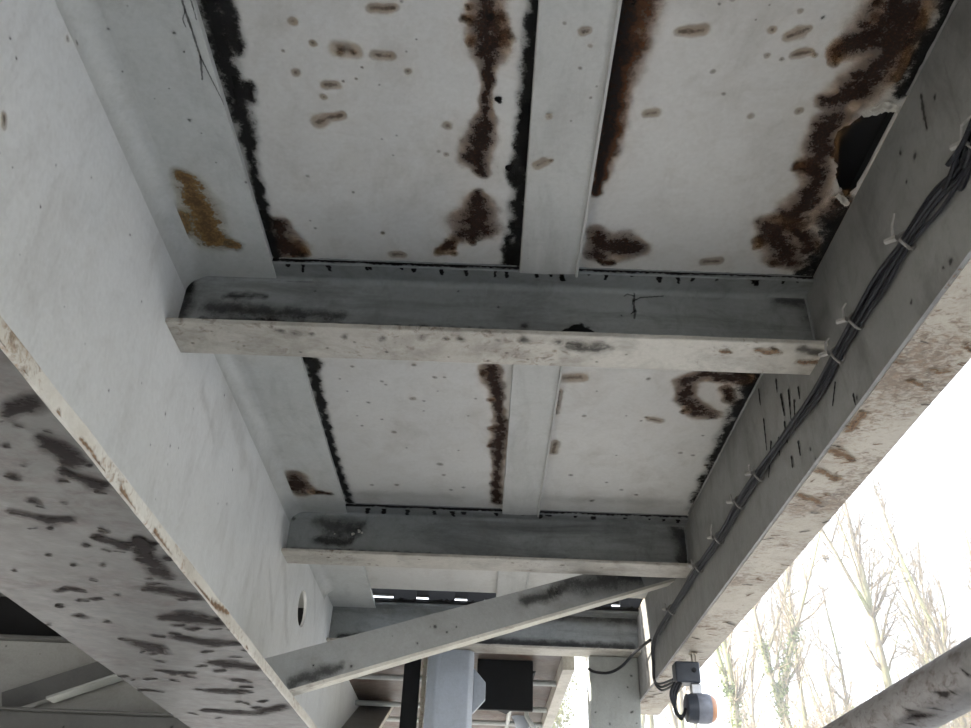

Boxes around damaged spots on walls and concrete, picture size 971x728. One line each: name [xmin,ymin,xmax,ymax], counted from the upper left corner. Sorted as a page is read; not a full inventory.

crack [181,0,224,105]
leakage [219,0,246,56]
rust [272,0,519,270]
leakage [505,134,519,181]
rust [579,0,937,279]
rust [173,169,242,251]
leakage [501,234,513,265]
crack [624,293,663,319]
rust [346,363,509,512]
rust [675,371,761,420]
rust [763,379,879,482]
rust [286,471,333,495]